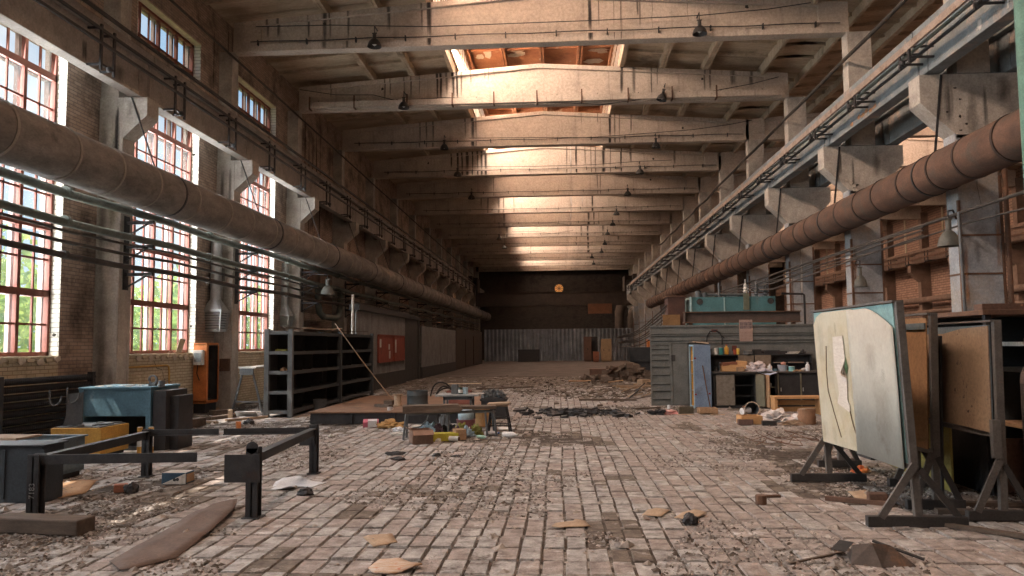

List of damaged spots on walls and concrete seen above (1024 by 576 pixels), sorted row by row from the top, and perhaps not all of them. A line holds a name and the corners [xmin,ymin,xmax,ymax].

leakage [588,0,599,39]
leakage [436,70,471,98]